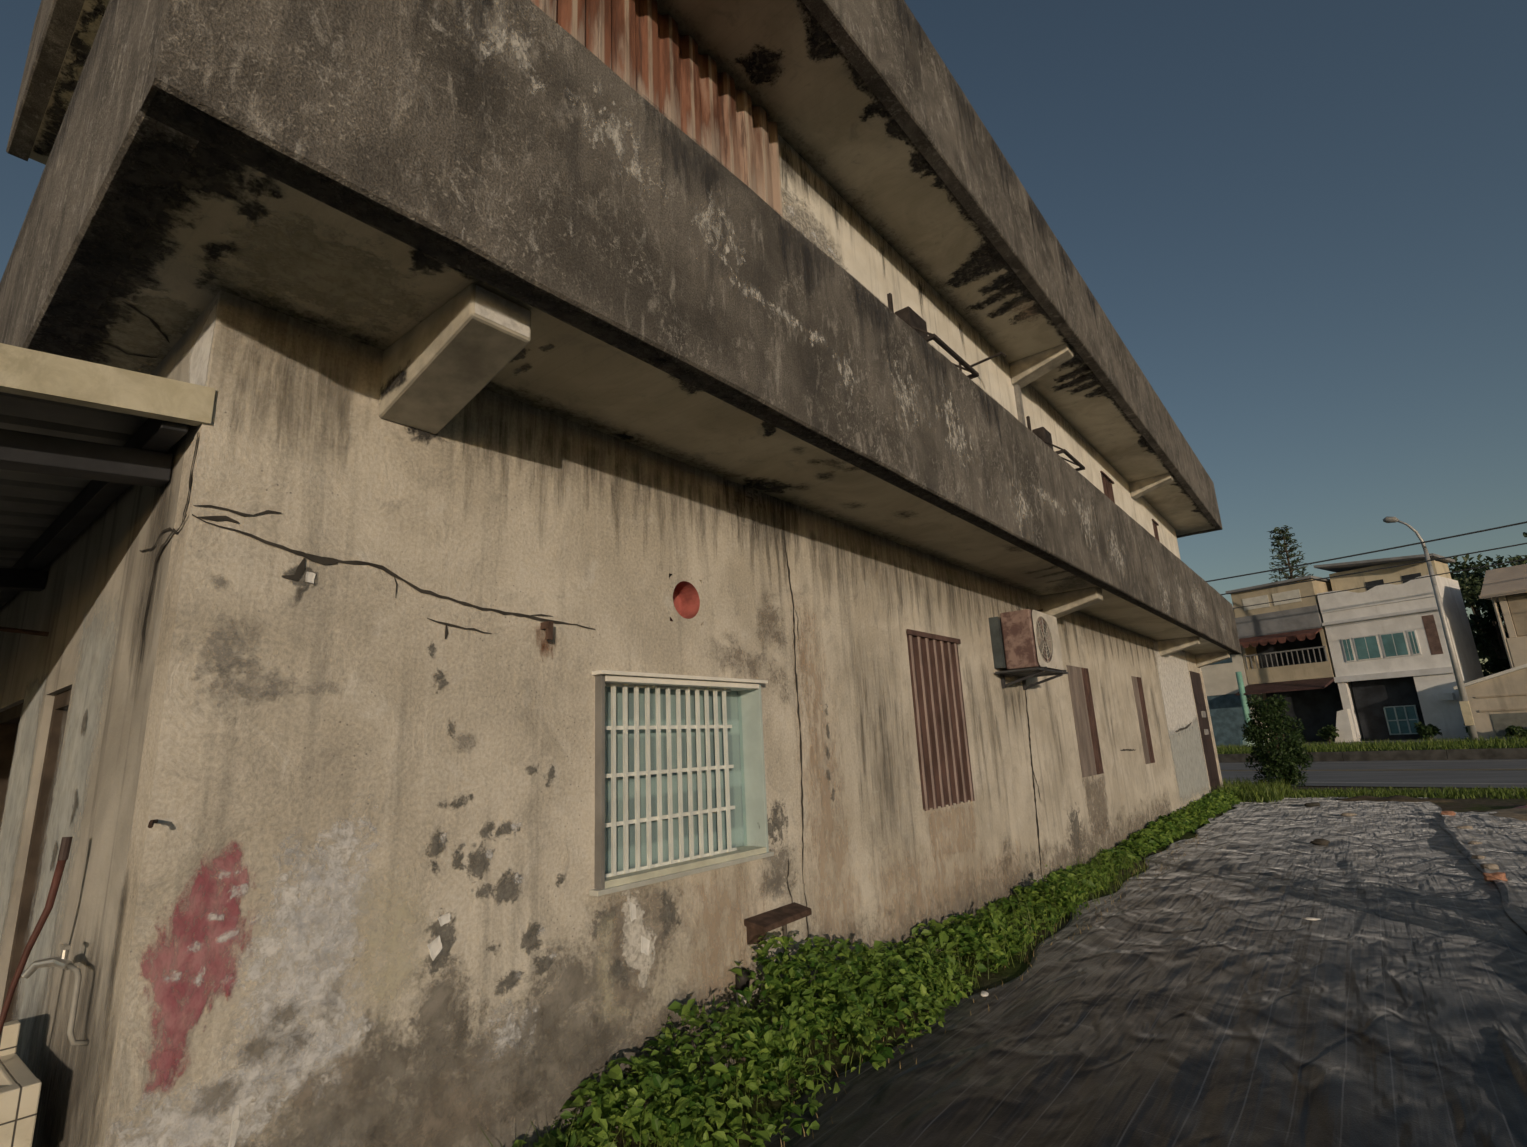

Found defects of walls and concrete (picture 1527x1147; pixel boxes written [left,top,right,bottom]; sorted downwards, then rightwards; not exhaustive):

mould [33,0,113,198]
damp [28,88,1240,664]
crack [140,433,593,662]
damp [19,886,126,1147]
peeling [110,820,376,1147]
flaking render [426,913,456,973]
spalling [439,794,473,808]
spalling [426,822,523,903]
damp [234,801,795,1147]
spalling [496,922,556,995]
crack [781,501,809,968]
damp [801,642,1169,1014]